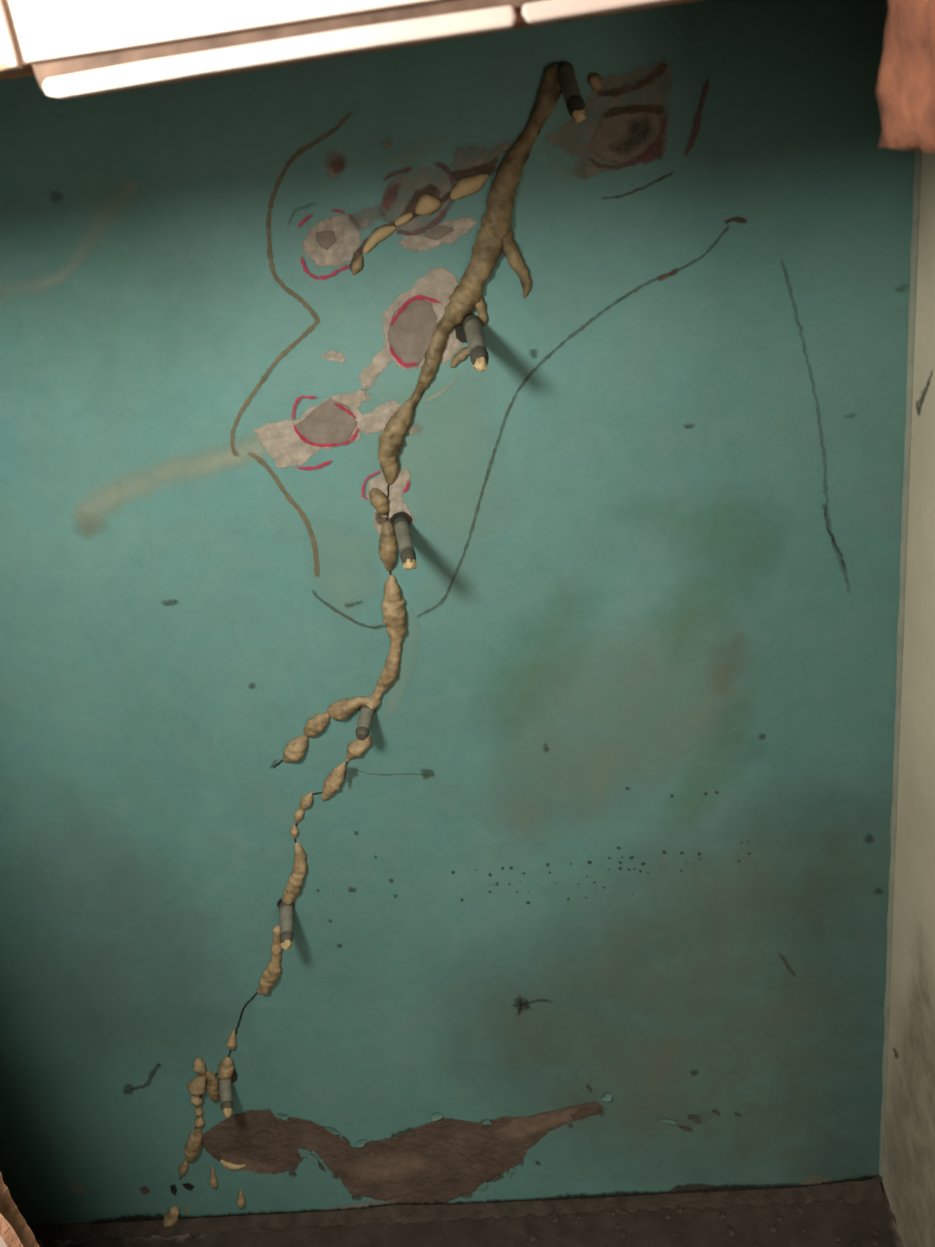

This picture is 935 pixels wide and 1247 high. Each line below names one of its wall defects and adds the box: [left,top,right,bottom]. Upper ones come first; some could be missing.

flaking render [301,142,511,267]
crack [349,167,495,270]
flaking render [254,267,463,468]
crack [313,762,356,795]
crack [195,992,258,1129]
peeling [202,1085,612,1204]